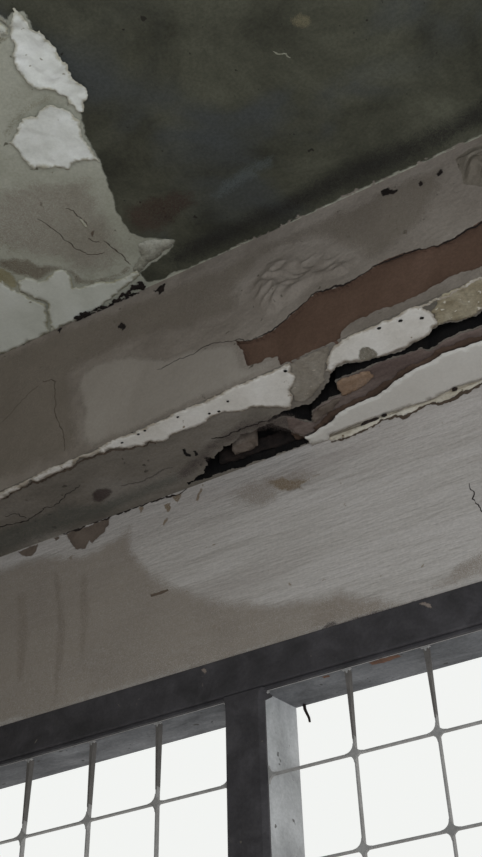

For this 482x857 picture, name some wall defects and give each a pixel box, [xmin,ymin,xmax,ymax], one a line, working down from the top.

crack [38,208,129,263]
spalling [0,0,482,354]
spalling [0,221,482,500]
peeling [54,518,110,549]
leakage [0,524,482,725]